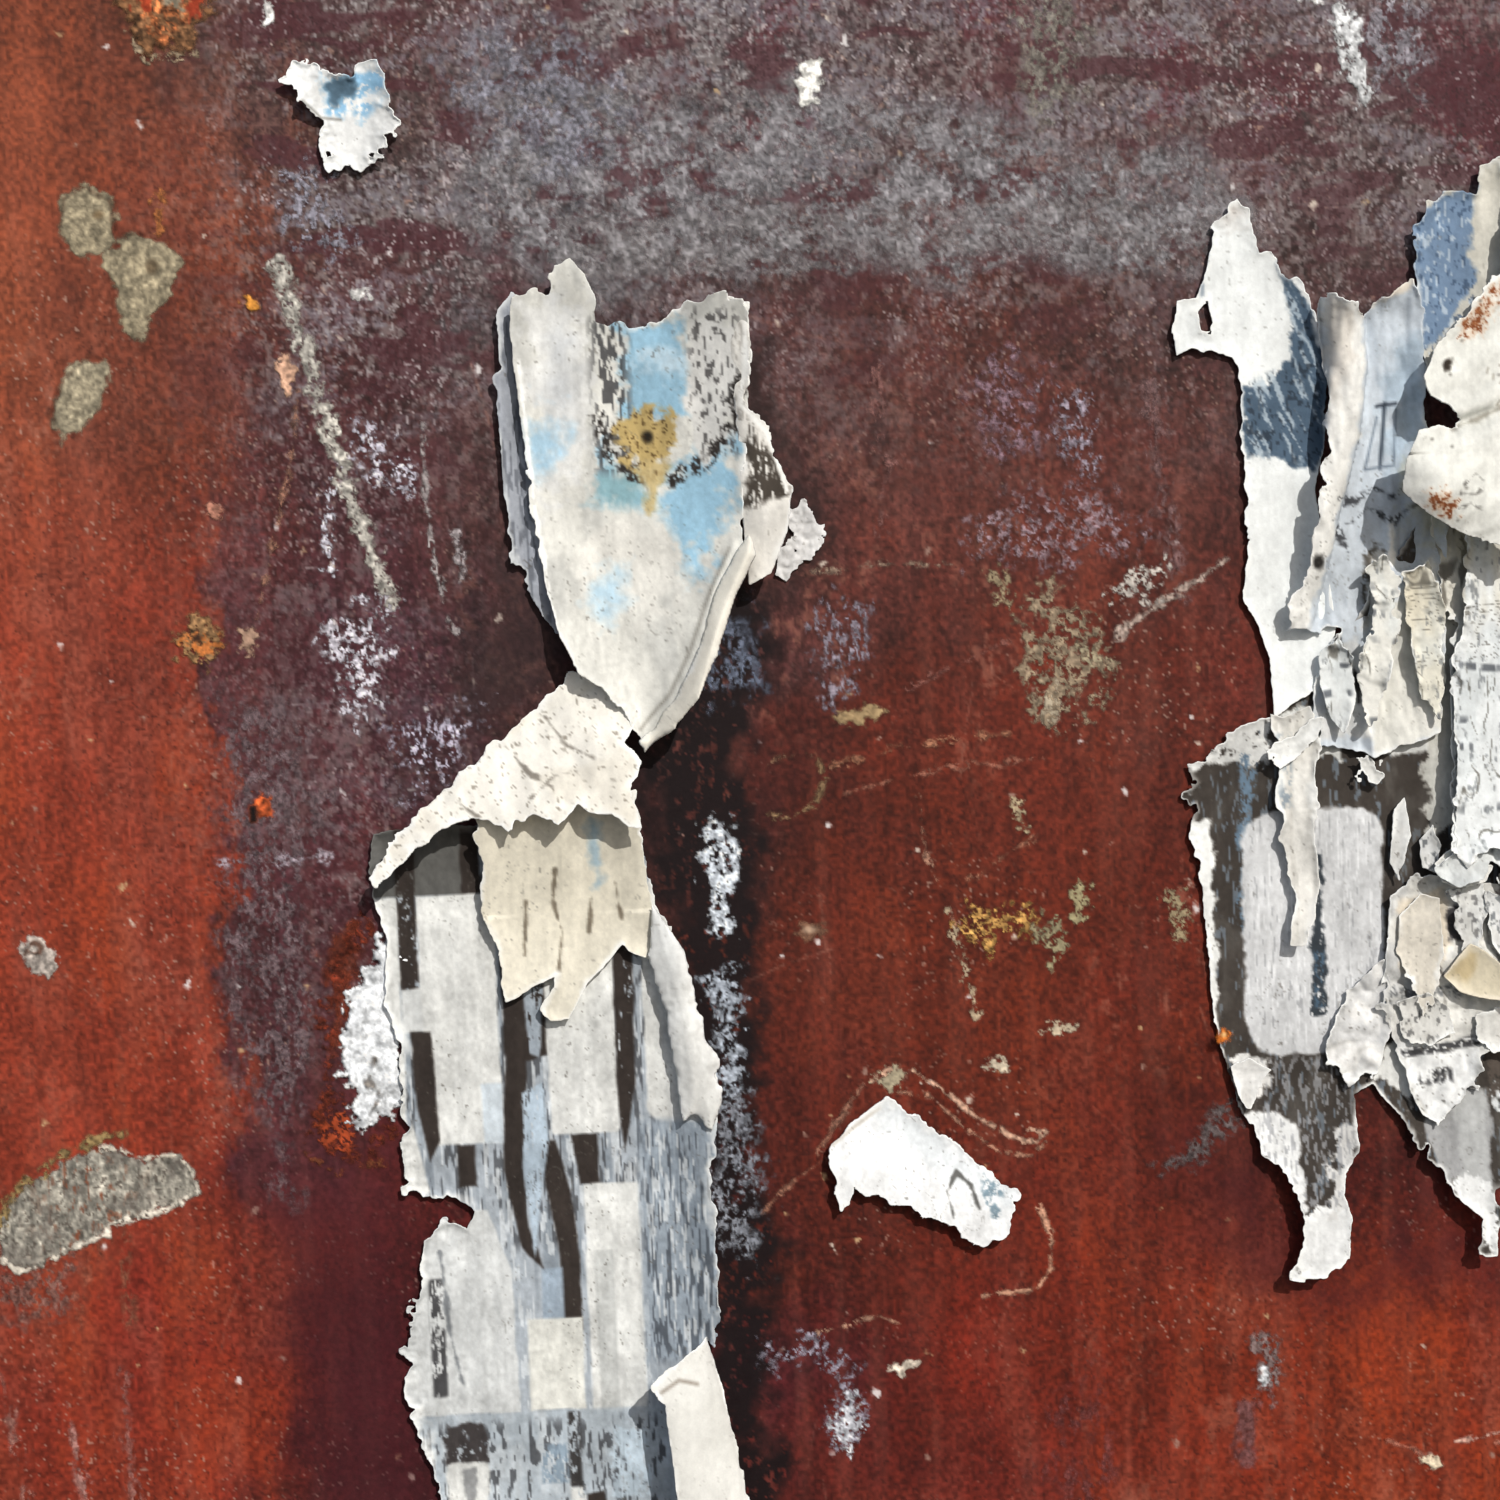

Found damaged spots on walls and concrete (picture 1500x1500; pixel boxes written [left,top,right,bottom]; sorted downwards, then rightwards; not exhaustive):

rust [113,0,215,65]
peeling [59,183,184,341]
rust [245,295,259,311]
peeling [350,287,373,301]
peeling [51,360,110,437]
rust [171,612,259,664]
rust [249,796,273,822]
rust [304,912,399,1177]
rust [1217,1029,1231,1043]
spalling [364,1056,381,1107]
peeling [0,1131,201,1323]